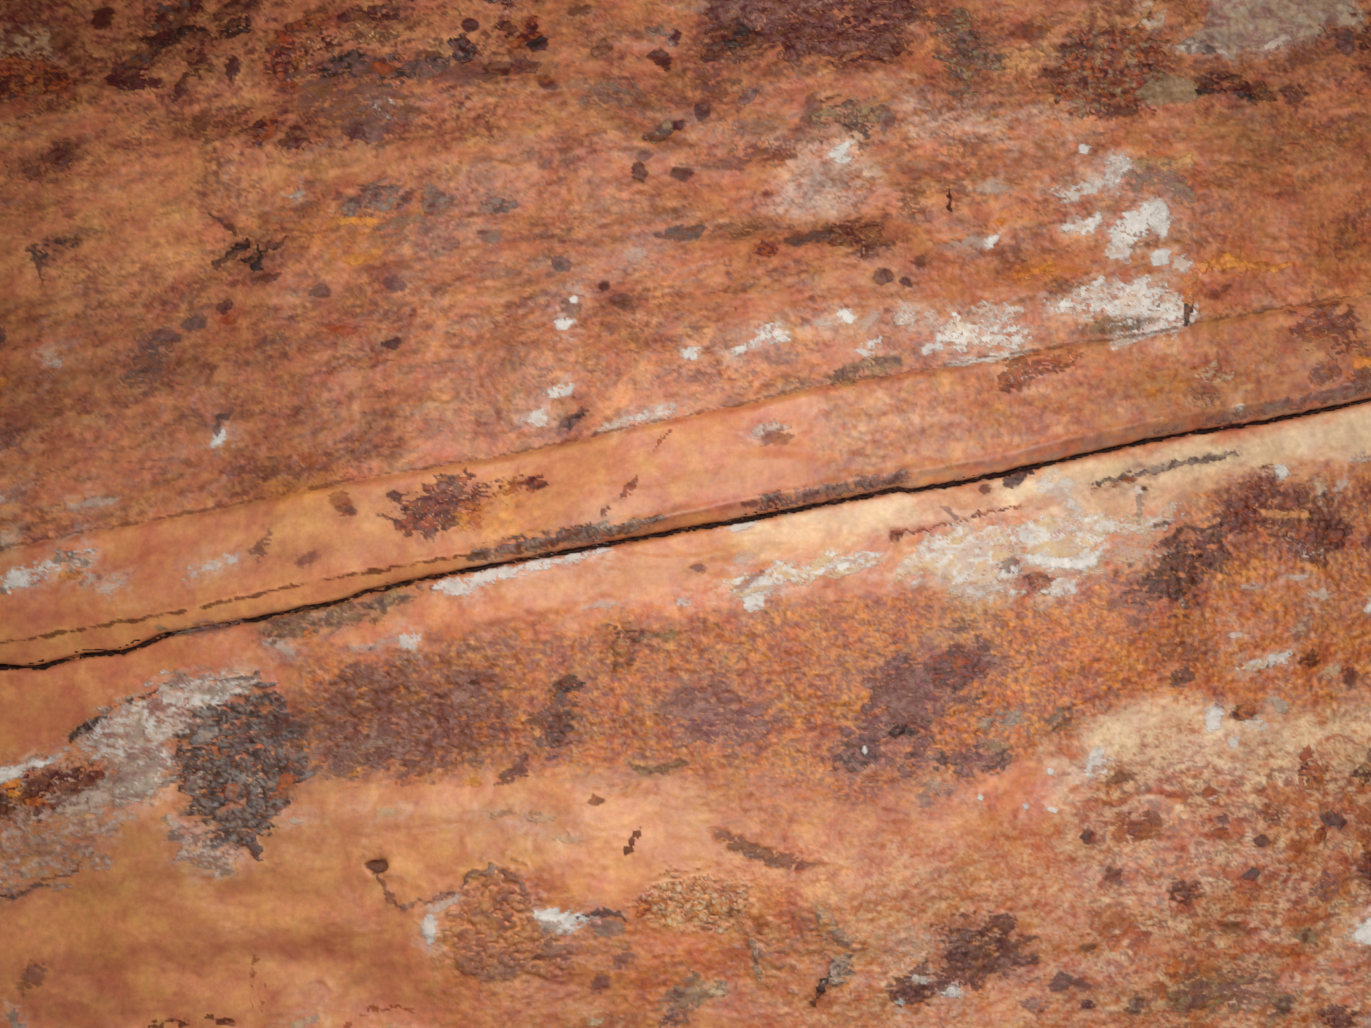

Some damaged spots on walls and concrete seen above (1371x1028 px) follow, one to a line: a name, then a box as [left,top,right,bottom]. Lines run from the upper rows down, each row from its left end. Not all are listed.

rust [104,0,259,103]
rust [186,0,558,150]
rust [631,0,1008,182]
rust [654,217,926,287]
rust [378,467,665,561]
crack [0,398,1371,670]
rust [1125,465,1371,617]
crack [69,674,186,743]
rust [293,648,585,787]
rust [828,620,1027,806]
rust [0,755,105,823]
rust [883,910,1095,1013]